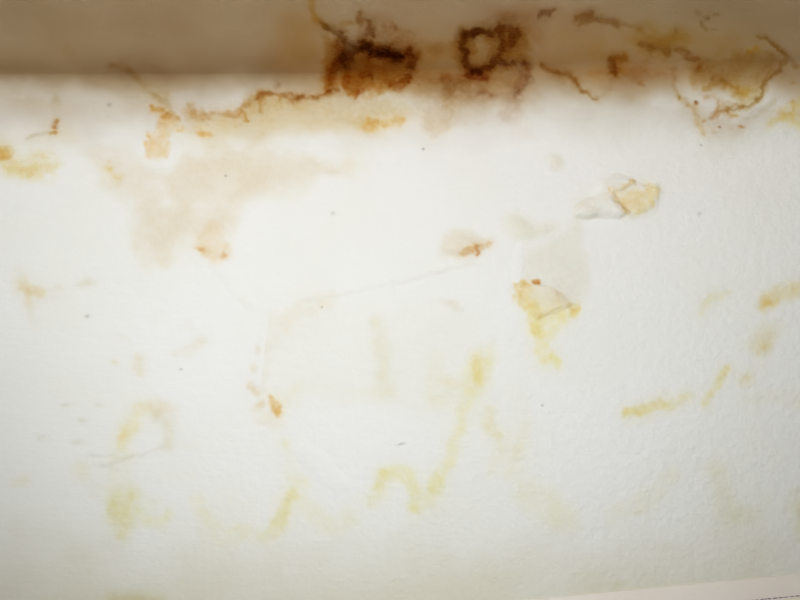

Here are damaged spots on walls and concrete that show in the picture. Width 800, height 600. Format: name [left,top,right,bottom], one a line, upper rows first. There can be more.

peeling [571,172,666,222]